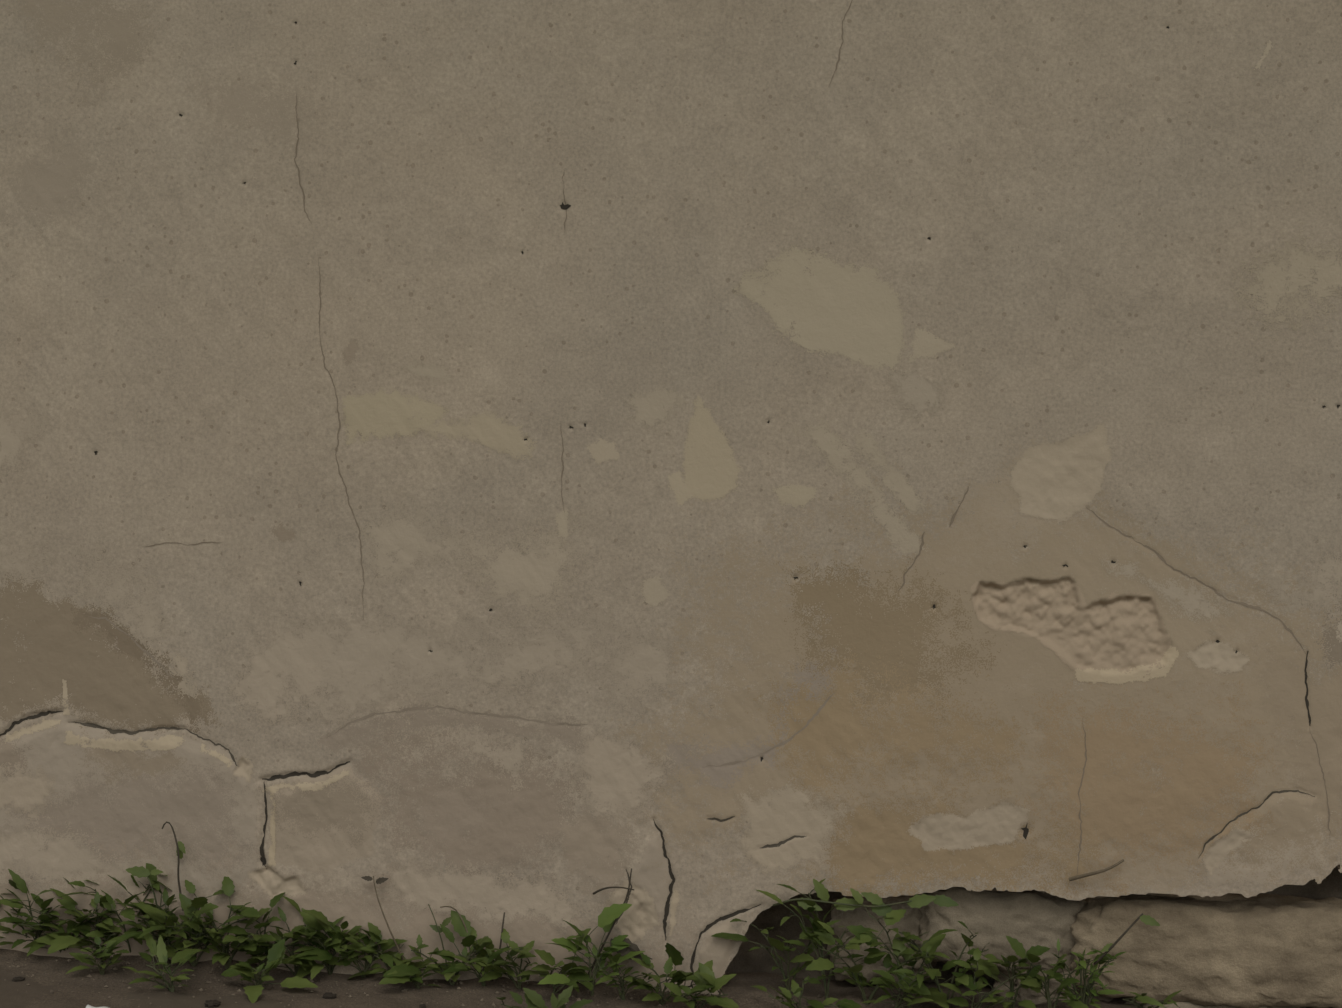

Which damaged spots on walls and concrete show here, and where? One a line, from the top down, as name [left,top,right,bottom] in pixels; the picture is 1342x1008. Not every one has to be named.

crack [827,1,852,91]
crack [294,93,311,222]
crack [318,264,364,616]
spalling [1075,639,1250,685]
crack [1086,507,1331,859]
crack [0,705,585,867]
leakage [0,572,708,992]
crack [615,870,632,925]
crack [653,819,761,988]
peeling [725,780,854,877]
spalling [906,799,1031,852]
crack [1077,723,1087,874]